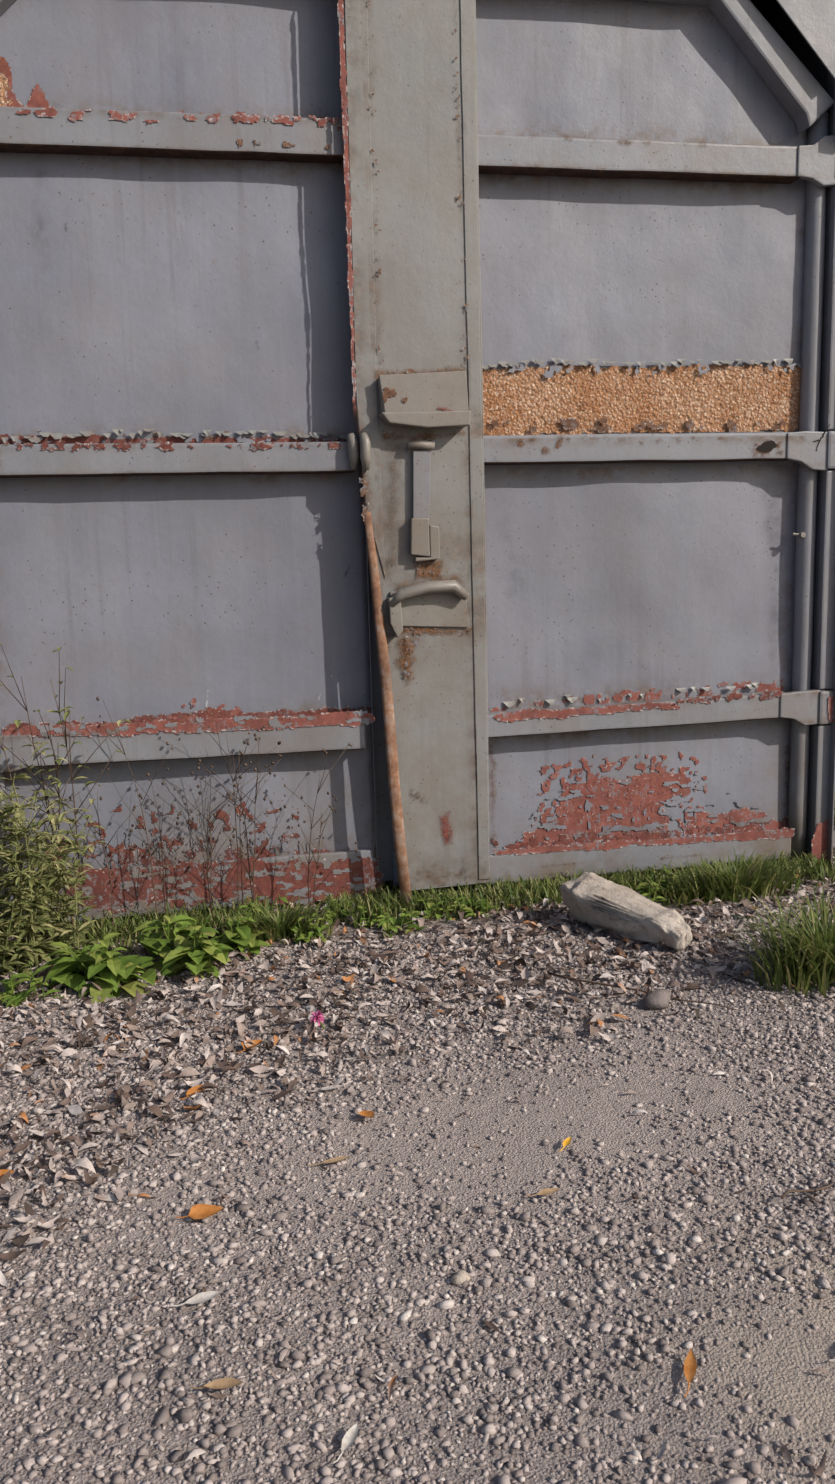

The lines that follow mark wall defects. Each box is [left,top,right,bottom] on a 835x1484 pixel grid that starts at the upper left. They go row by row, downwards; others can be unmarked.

peeling [16,83,159,123]
peeling [177,0,357,410]
peeling [0,428,347,452]
rust [359,471,369,522]